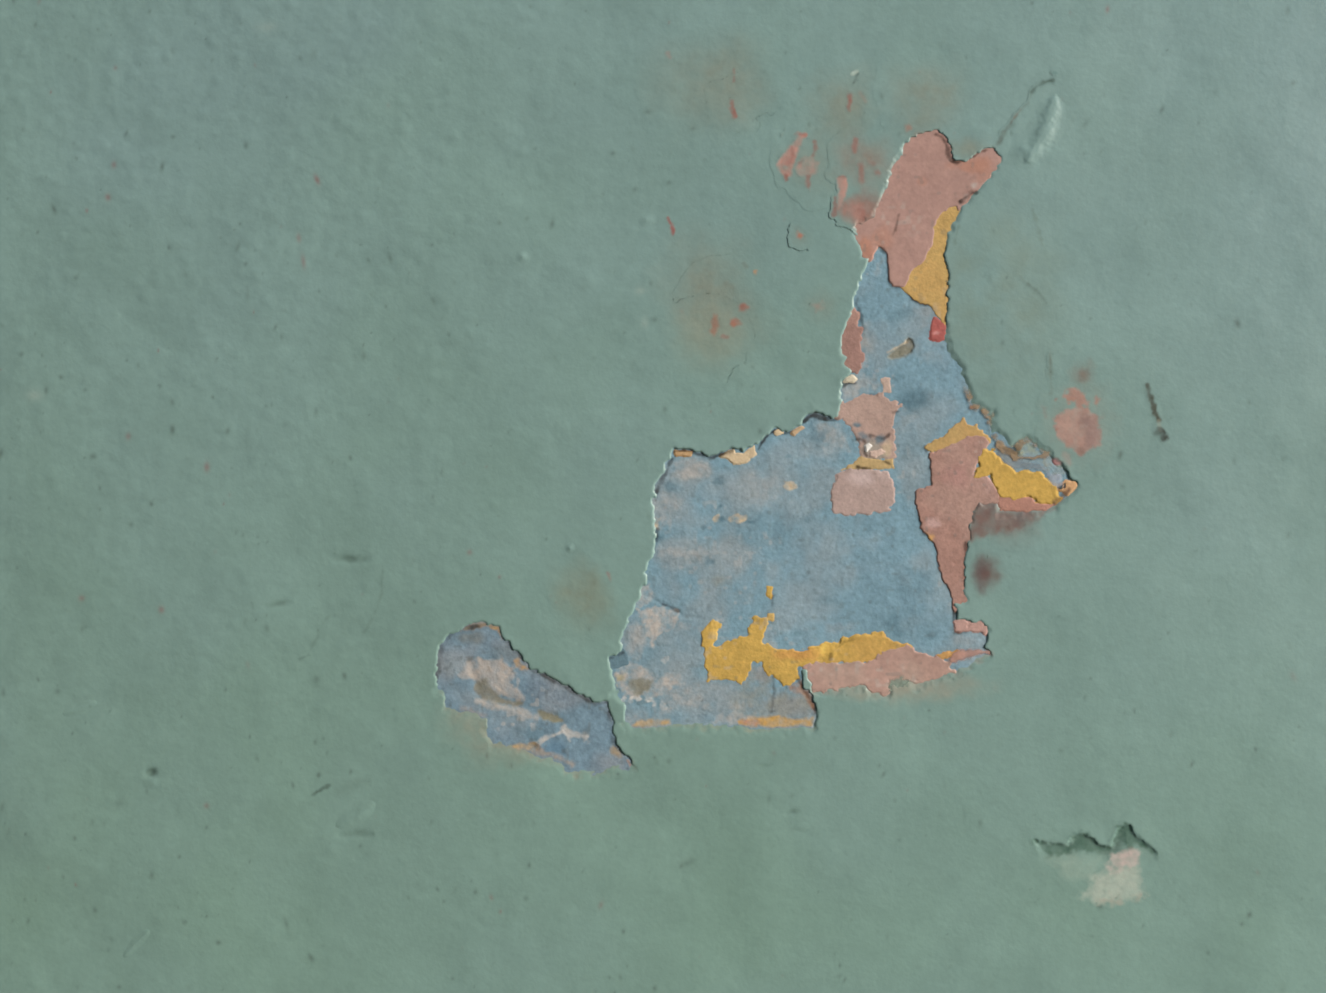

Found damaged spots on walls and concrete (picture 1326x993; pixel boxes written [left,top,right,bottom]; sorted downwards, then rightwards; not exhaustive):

peeling [435,121,1132,784]